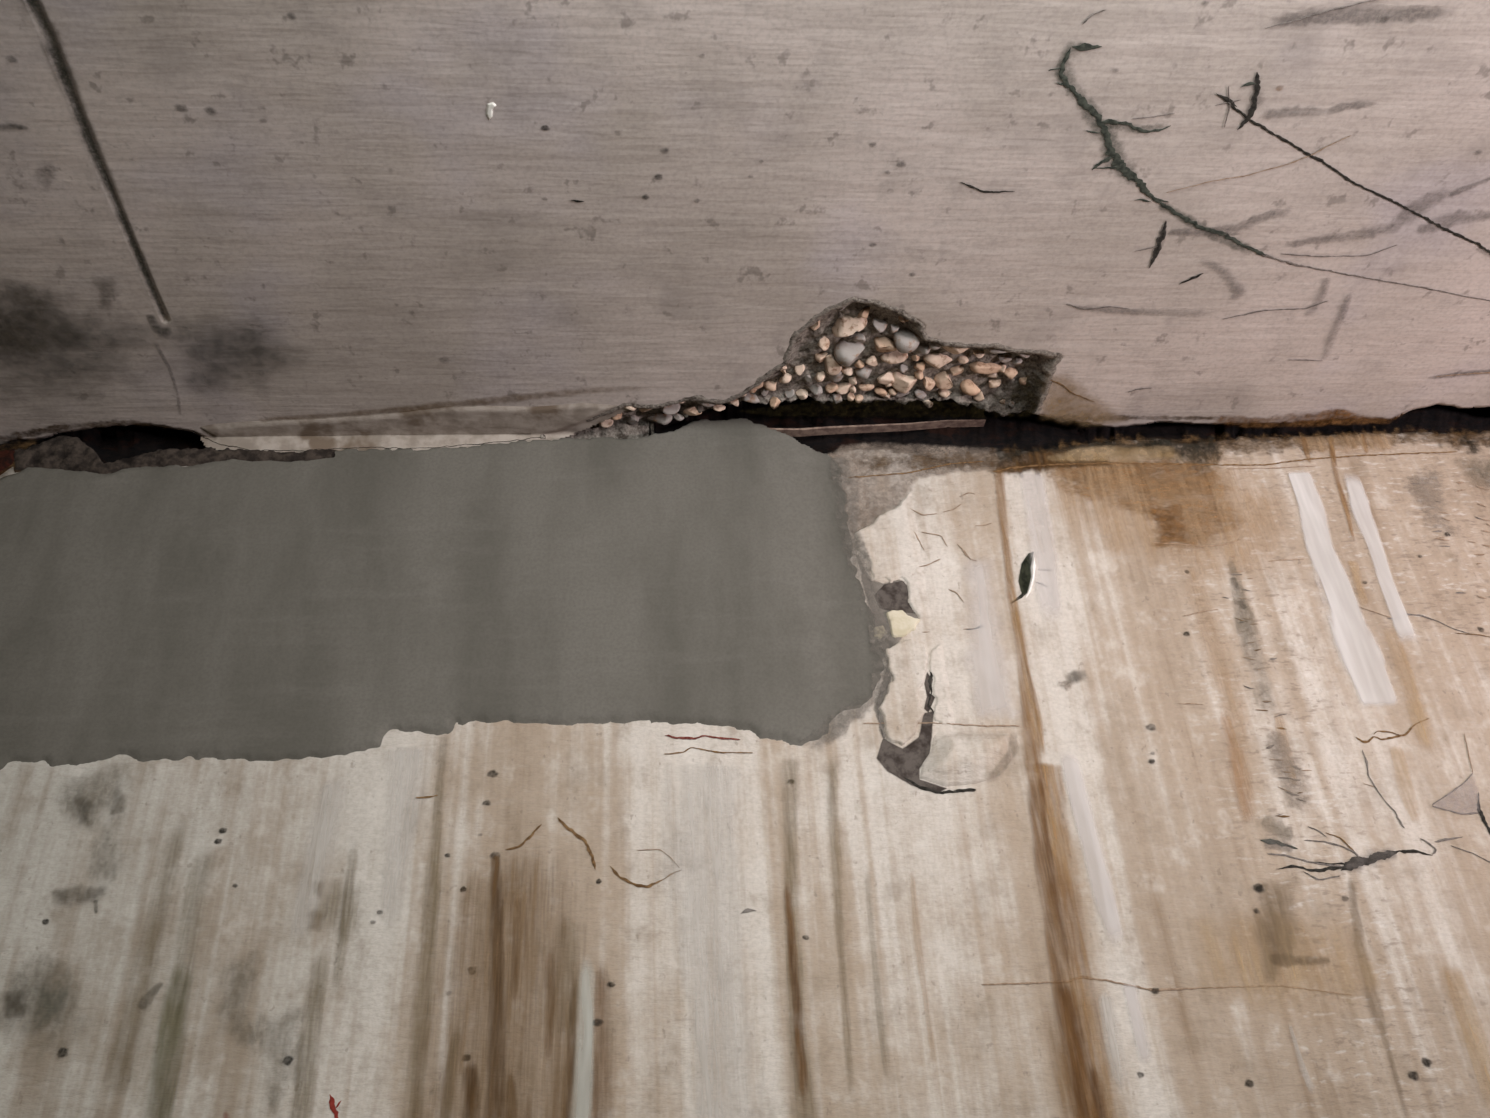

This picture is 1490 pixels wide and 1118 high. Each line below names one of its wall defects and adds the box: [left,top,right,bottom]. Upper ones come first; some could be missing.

crack [1049,10,1490,319]
crack [0,421,546,463]
spalling [565,297,1063,439]
crack [649,372,1490,478]
rust [998,439,1236,633]
rust [1219,409,1386,461]
rust [1338,483,1353,534]
peeling [829,444,992,791]
rust [492,856,537,1018]
crack [505,818,681,888]
rust [1021,657,1111,1118]
crack [1260,718,1490,880]